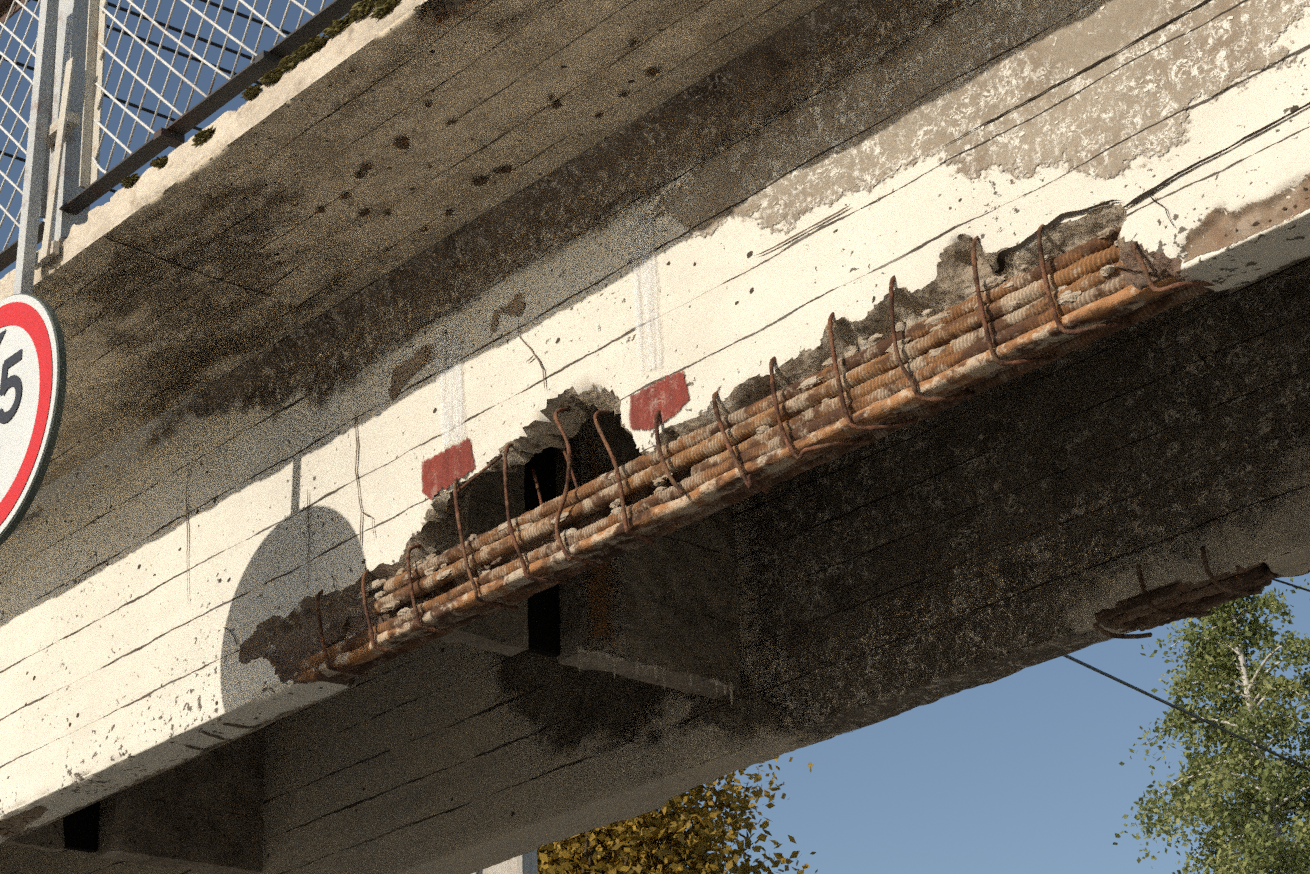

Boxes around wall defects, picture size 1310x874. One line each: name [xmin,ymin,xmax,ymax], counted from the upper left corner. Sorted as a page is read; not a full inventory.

spalling [415,0,471,32]
peeling [639,0,1310,242]
peeling [392,136,410,150]
peeling [471,165,513,186]
leakage [146,0,964,448]
peeling [239,174,1310,755]
leakage [688,674,733,705]